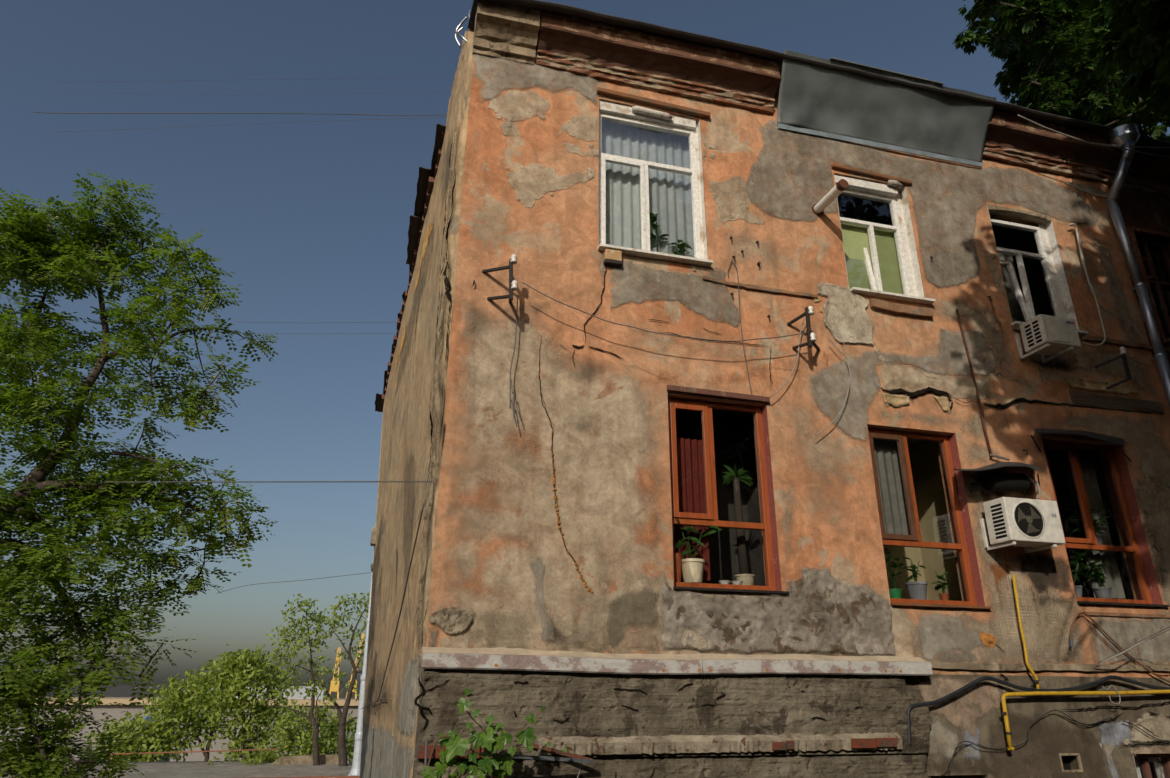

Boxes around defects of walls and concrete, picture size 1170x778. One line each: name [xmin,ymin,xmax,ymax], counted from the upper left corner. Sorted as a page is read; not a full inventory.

peeling [488,90,550,136]
peeling [506,114,599,208]
peeling [709,175,764,225]
crack [426,127,456,486]
crack [648,319,803,385]
flaking render [814,282,880,352]
crack [874,364,1074,409]
crack [538,252,665,593]
peeling [415,314,1082,664]
flaking render [772,740,795,750]
flaking render [851,738,897,748]
peeling [917,677,1008,765]